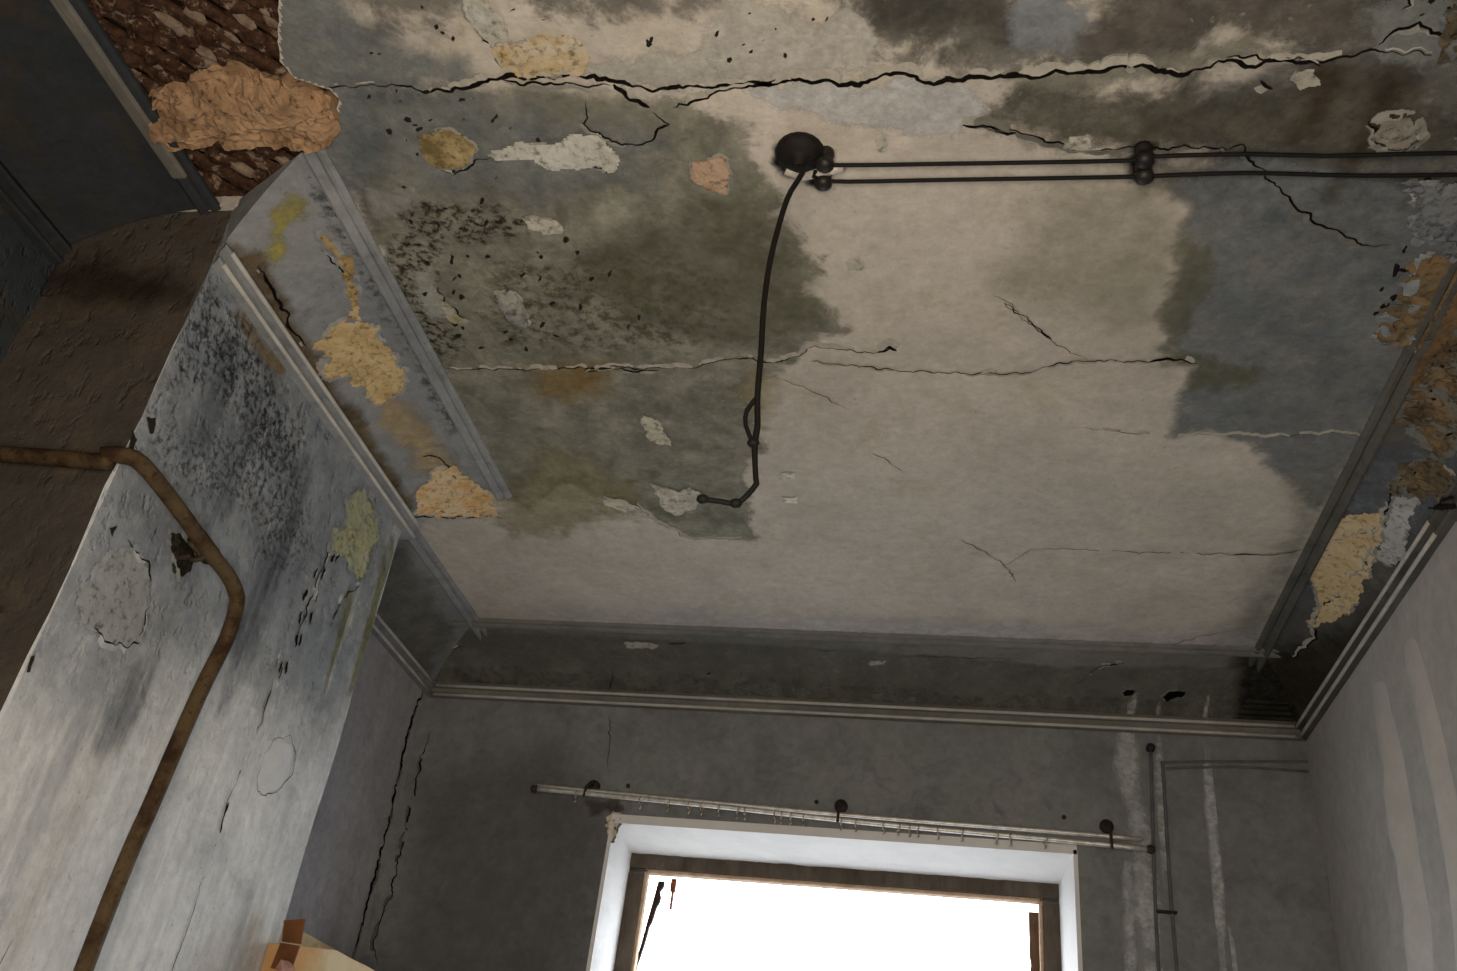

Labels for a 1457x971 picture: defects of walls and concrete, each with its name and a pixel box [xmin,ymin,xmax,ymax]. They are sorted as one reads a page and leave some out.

peeling [312,230,410,408]
peeling [386,89,620,179]
water stain [279,0,850,540]
crack [447,290,1197,408]
crack [329,0,1442,175]
water stain [841,0,1457,505]
crack [963,116,1391,249]
peeling [1359,0,1457,73]
water stain [32,258,1355,722]
peeling [1305,178,1457,971]
crack [353,691,430,965]
water stain [1115,732,1167,971]